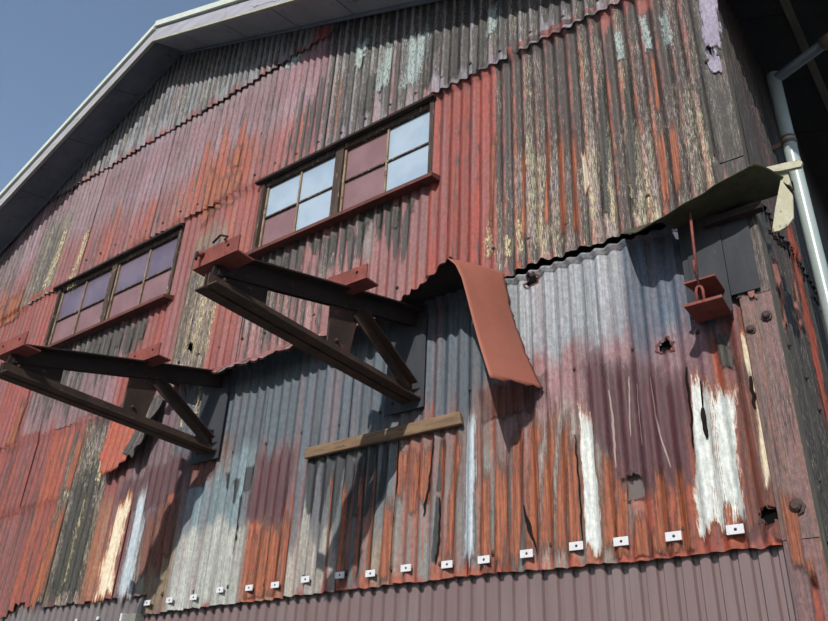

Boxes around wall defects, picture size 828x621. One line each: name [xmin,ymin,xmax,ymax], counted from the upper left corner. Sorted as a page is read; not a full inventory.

leakage [358,72,376,115]
leakage [424,17,466,90]
leakage [473,8,488,75]
peeling [699,0,722,73]
leakage [48,448,102,600]
rust [117,452,216,582]
rust [242,443,293,598]
rust [323,426,462,588]
rust [478,371,581,573]
peeling [577,399,603,559]
rust [582,348,695,560]
peeling [690,368,747,544]